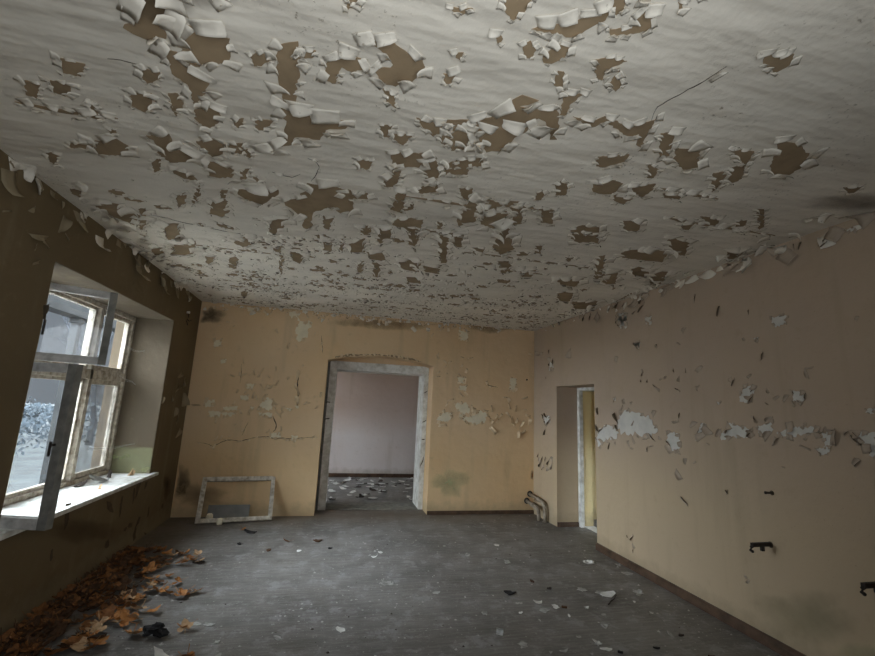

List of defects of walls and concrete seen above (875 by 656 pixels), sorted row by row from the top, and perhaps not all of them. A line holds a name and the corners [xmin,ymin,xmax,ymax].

crack [652,66,728,118]
crack [198,401,330,448]
peeling [437,368,550,438]
peeling [595,397,687,480]
peeling [689,416,875,467]